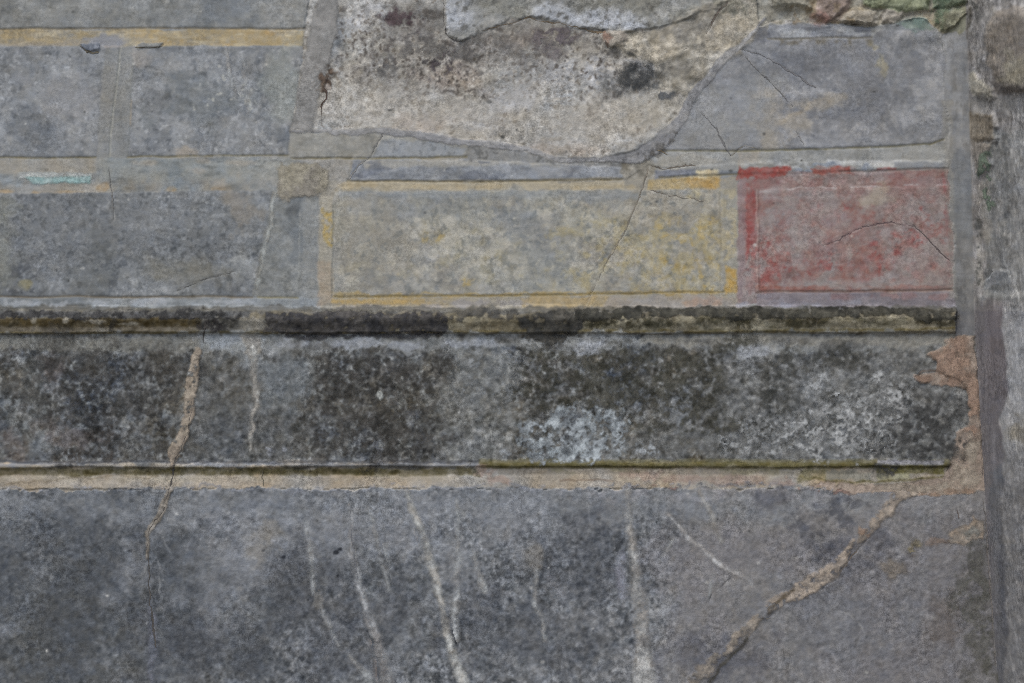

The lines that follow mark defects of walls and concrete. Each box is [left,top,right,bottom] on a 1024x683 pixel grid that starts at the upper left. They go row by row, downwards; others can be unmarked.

flaking render [296,0,800,162]
crack [701,113,756,156]
crack [741,49,816,144]
crack [584,150,702,308]
crack [828,221,949,260]
spalling [791,335,985,496]
crack [145,320,206,680]
crack [688,483,917,683]